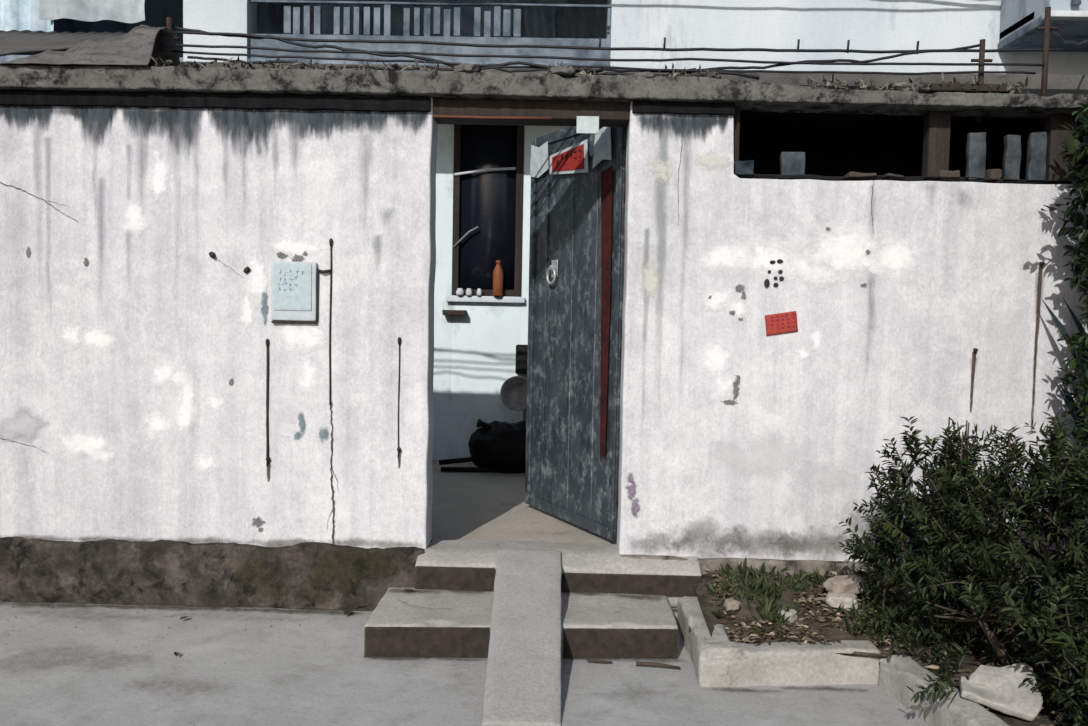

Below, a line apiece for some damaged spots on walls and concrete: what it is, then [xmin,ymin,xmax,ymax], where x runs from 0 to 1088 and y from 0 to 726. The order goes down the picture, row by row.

damp [0,105,427,146]
damp [640,114,728,163]
damp [645,177,664,270]
peeling [701,226,919,287]
peeling [704,284,747,320]
rust [1031,262,1045,430]
rust [970,348,978,412]
crack [327,401,338,544]